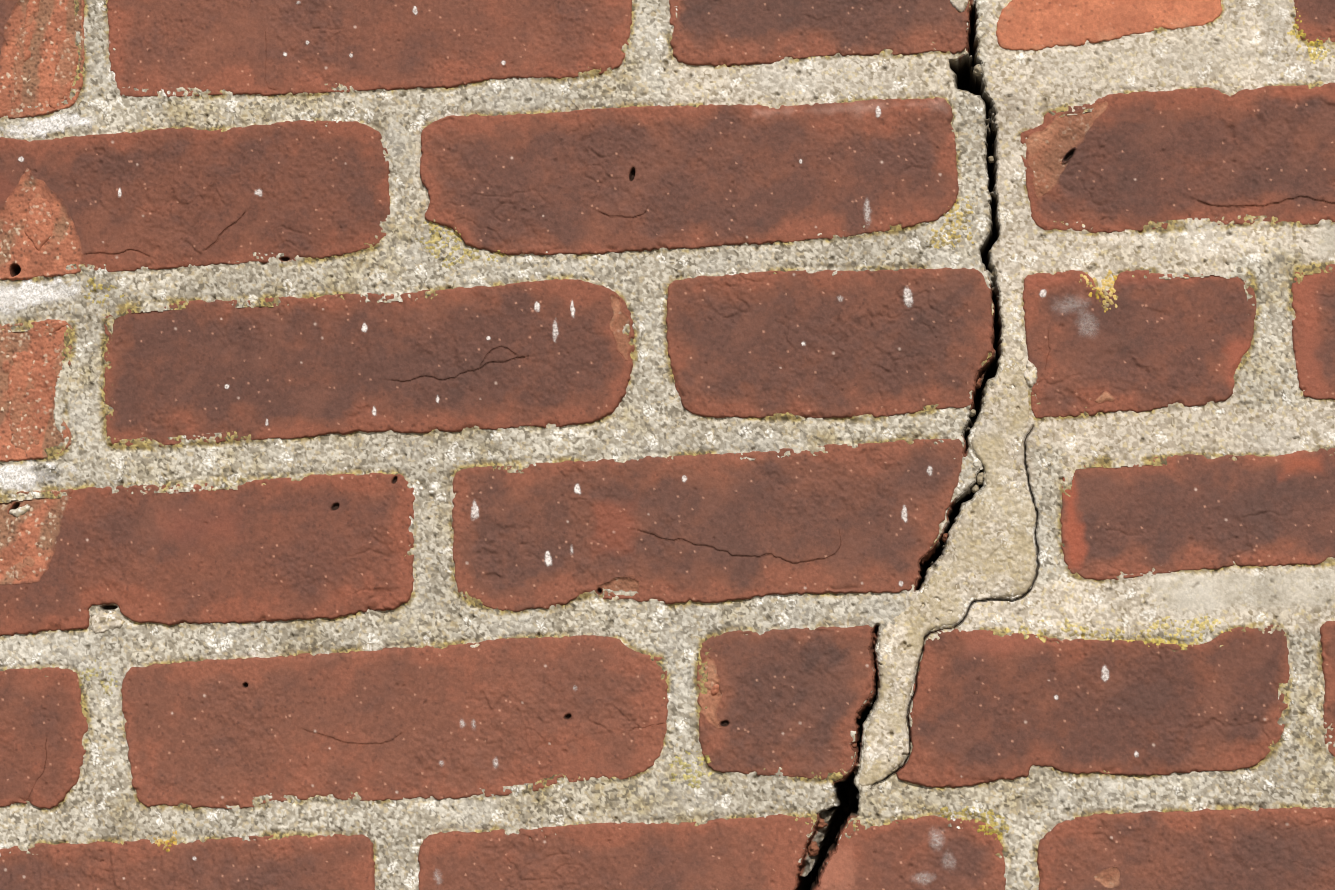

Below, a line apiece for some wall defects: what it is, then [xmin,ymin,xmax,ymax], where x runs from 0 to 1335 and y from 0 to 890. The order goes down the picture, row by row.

spalling [0,0,85,119]
spalling [0,168,84,281]
crack [1198,196,1335,207]
crack [914,0,1005,592]
crack [637,529,842,563]
crack [794,426,1040,890]